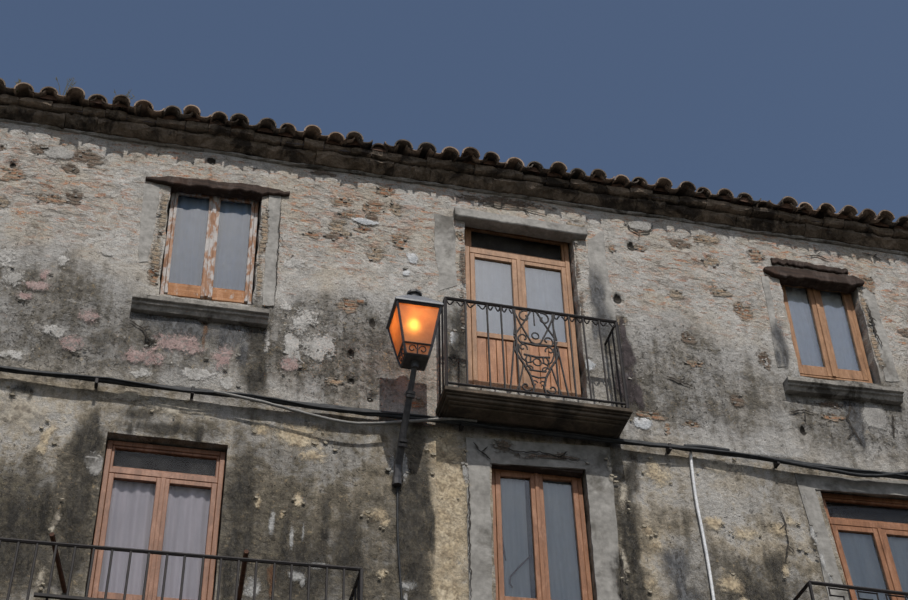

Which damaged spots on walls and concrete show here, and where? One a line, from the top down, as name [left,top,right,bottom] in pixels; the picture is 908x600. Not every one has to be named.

peeling [17,270,54,301]
peeling [60,336,87,354]
peeling [126,334,241,370]
peeling [280,355,302,375]
leakage [590,273,644,409]
leakage [10,383,33,398]
leakage [626,455,639,491]
leakage [58,413,101,586]
leakage [398,471,435,600]
leakage [612,501,643,600]
leakage [664,550,702,600]